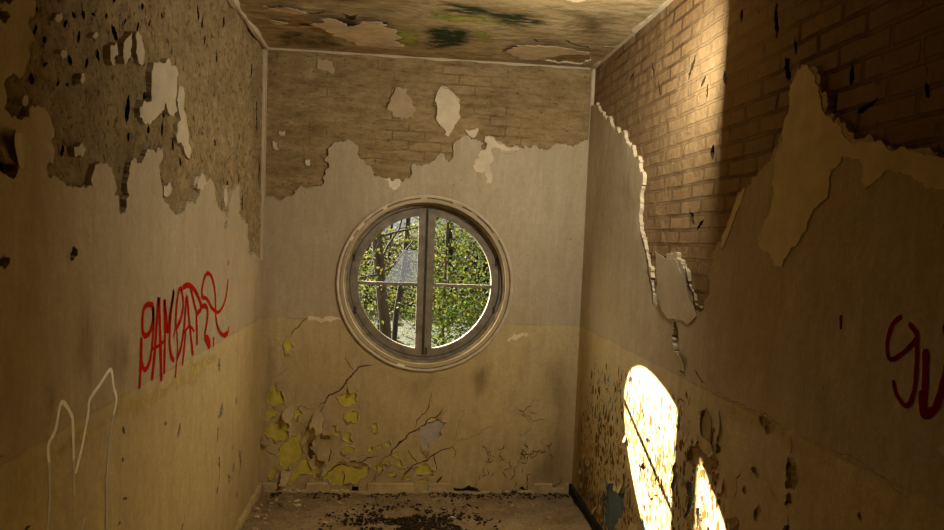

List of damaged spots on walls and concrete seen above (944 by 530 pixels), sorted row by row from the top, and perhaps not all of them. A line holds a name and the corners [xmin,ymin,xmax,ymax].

spalling [4,0,944,325]
crack [319,358,377,412]
peeling [261,382,448,487]
crack [382,393,495,483]
peeling [578,363,760,530]